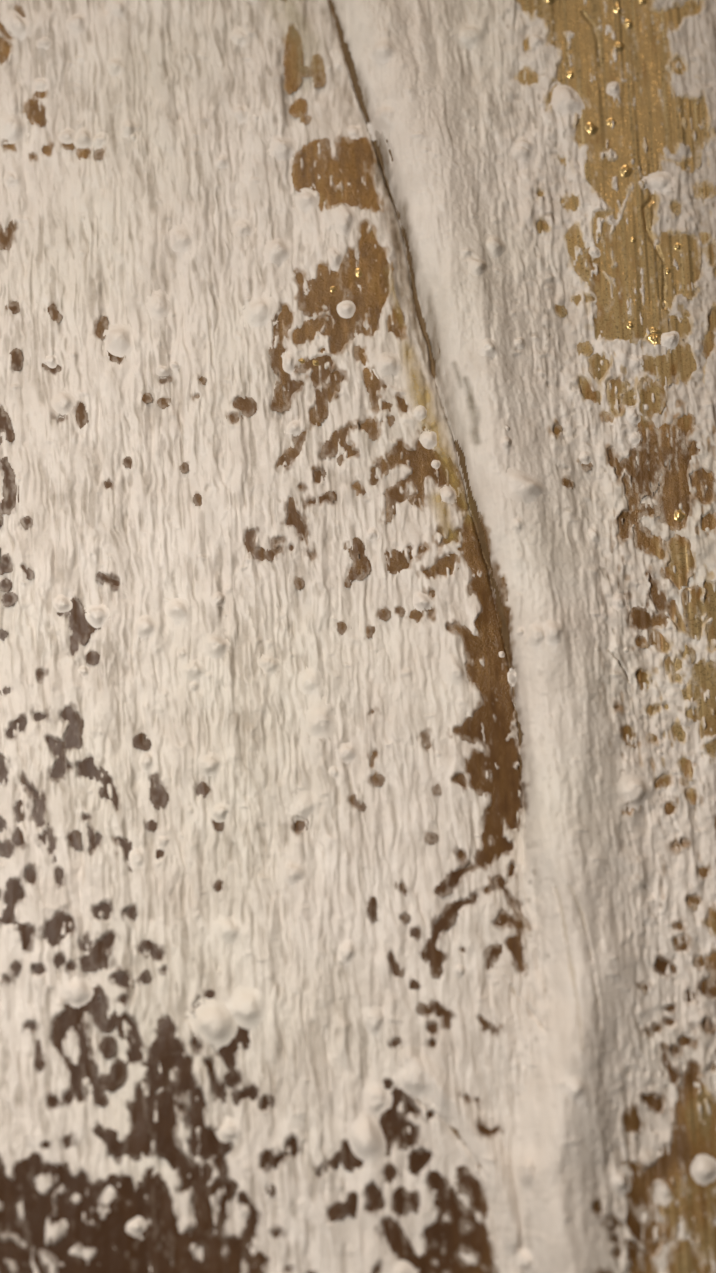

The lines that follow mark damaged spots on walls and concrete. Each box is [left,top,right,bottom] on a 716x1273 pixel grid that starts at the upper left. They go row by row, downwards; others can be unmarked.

peeling [0,405,33,530]
peeling [226,136,408,561]
crack [329,0,524,779]
peeling [517,0,716,756]
peeling [0,754,132,886]
peeling [46,706,118,811]
peeling [350,426,529,980]
peeling [0,867,274,1273]
peeling [317,1139,363,1176]
peeling [327,1079,500,1273]
peeling [389,951,452,1047]
peeling [593,923,716,1273]